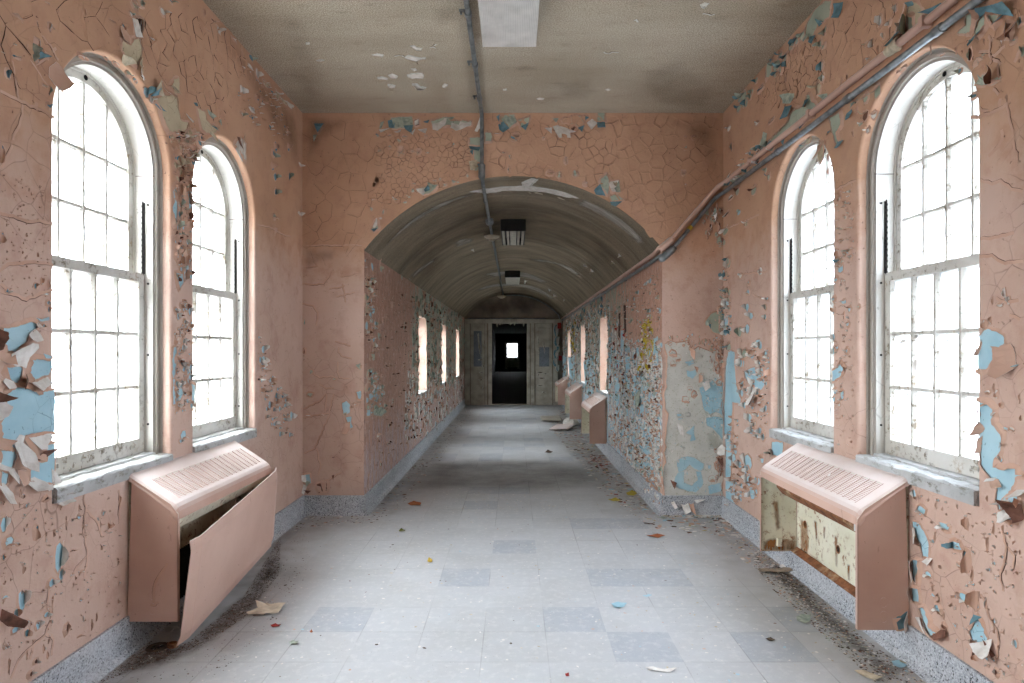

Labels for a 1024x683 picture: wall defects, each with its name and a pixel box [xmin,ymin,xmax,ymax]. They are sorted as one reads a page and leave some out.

crack [0,0,116,168]
peeling [861,0,941,67]
peeling [930,1,1024,101]
crack [0,212,53,225]
crack [0,260,53,302]
peeling [104,0,222,415]
peeling [370,113,625,233]
crack [302,113,723,303]
peeling [539,0,881,527]
peeling [0,179,123,680]
peeling [391,289,482,445]
peeling [892,287,1024,679]